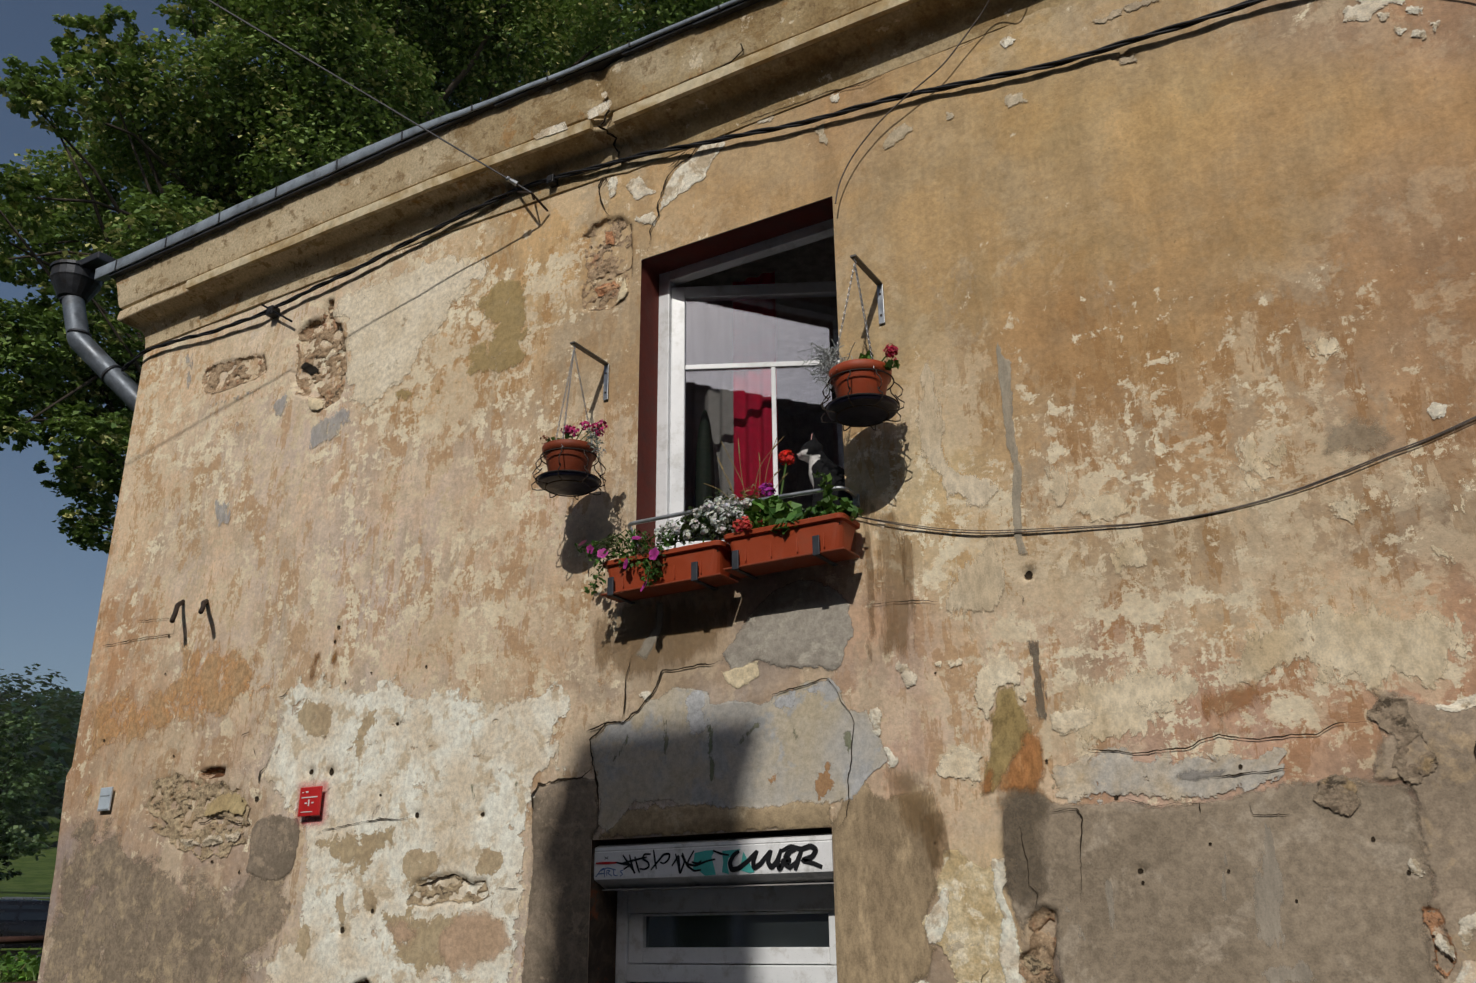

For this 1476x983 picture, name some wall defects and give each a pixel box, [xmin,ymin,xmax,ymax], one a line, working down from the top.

crack [681,43,744,84]
peeling [1343,0,1440,40]
crack [598,108,623,216]
flaking render [581,135,725,310]
flaking render [185,354,267,405]
peeling [274,254,490,449]
flaking render [144,767,252,862]
peeling [264,673,571,983]
peeling [591,661,898,831]
crack [1055,808,1083,902]
crack [1084,721,1372,816]
peeling [922,850,1060,983]